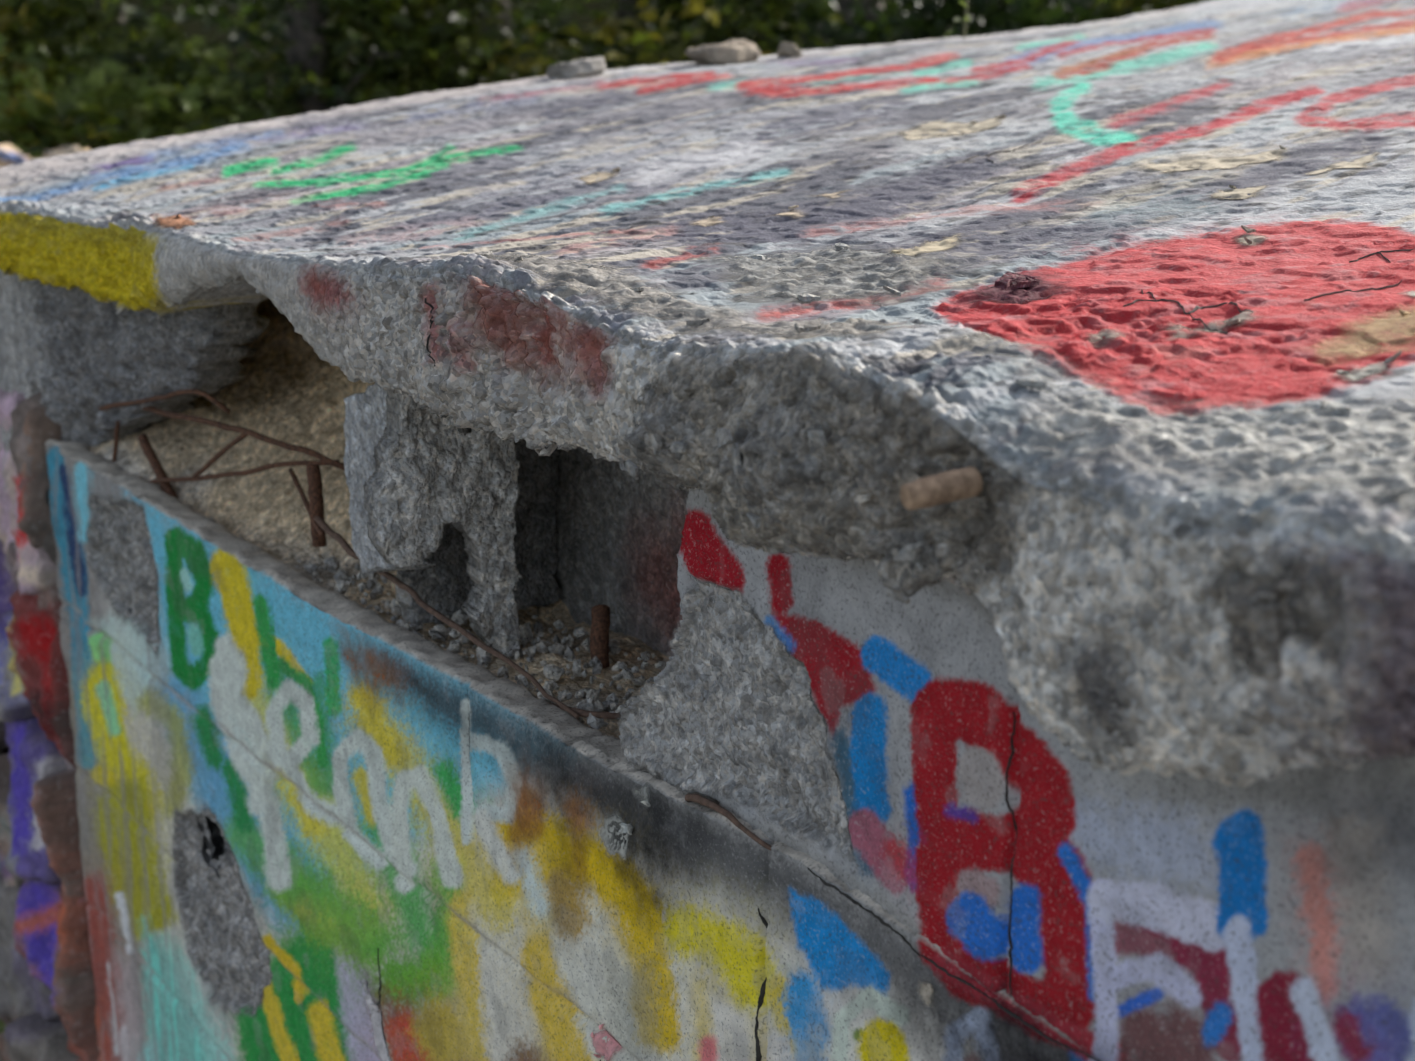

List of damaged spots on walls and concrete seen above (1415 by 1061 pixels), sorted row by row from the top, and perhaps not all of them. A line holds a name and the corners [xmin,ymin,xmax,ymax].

spalling [137,434,178,499]
spalling [306,464,327,548]
spalling [86,496,161,654]
spalling [589,604,610,668]
spalling [172,808,273,1014]
crack [757,908,768,929]
crack [807,712,1099,1061]
crack [755,977,767,1061]